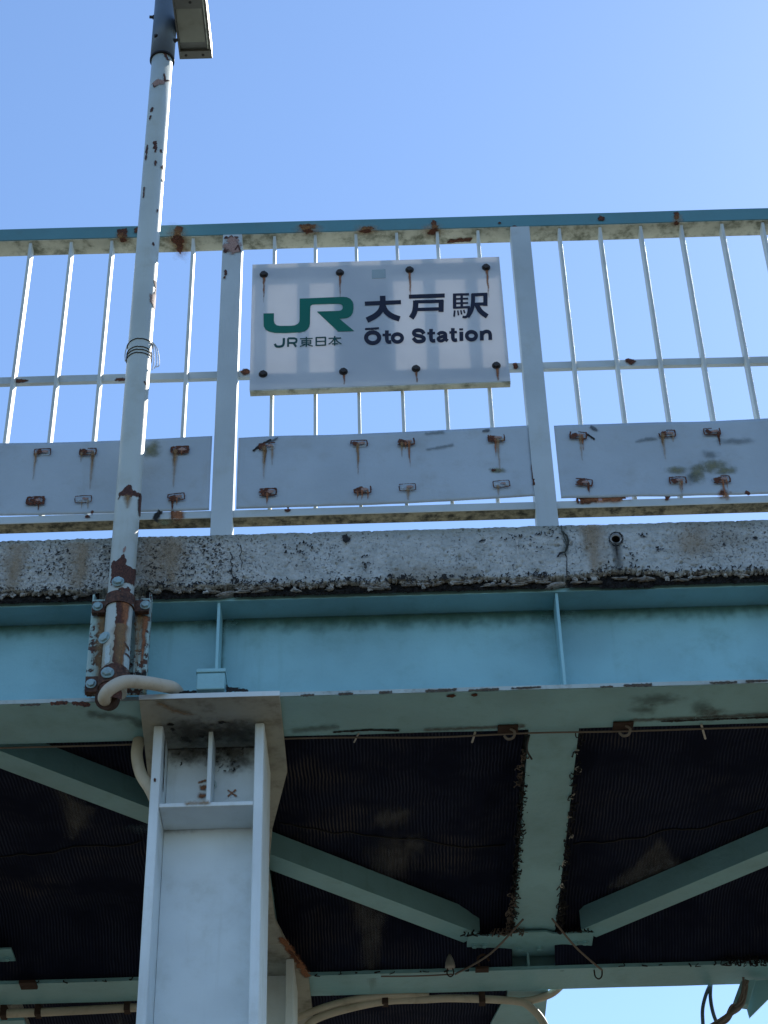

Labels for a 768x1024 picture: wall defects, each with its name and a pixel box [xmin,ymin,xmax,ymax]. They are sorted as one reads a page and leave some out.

rust [117,227,138,242]
rust [171,226,186,254]
rust [427,220,472,243]
rust [170,445,189,472]
rust [398,438,415,460]
rust [26,496,45,510]
rust [167,492,185,519]
rust [353,486,372,498]
rust [575,478,628,504]
rust [713,475,731,497]
crack [557,525,569,575]
spalling [0,541,768,670]